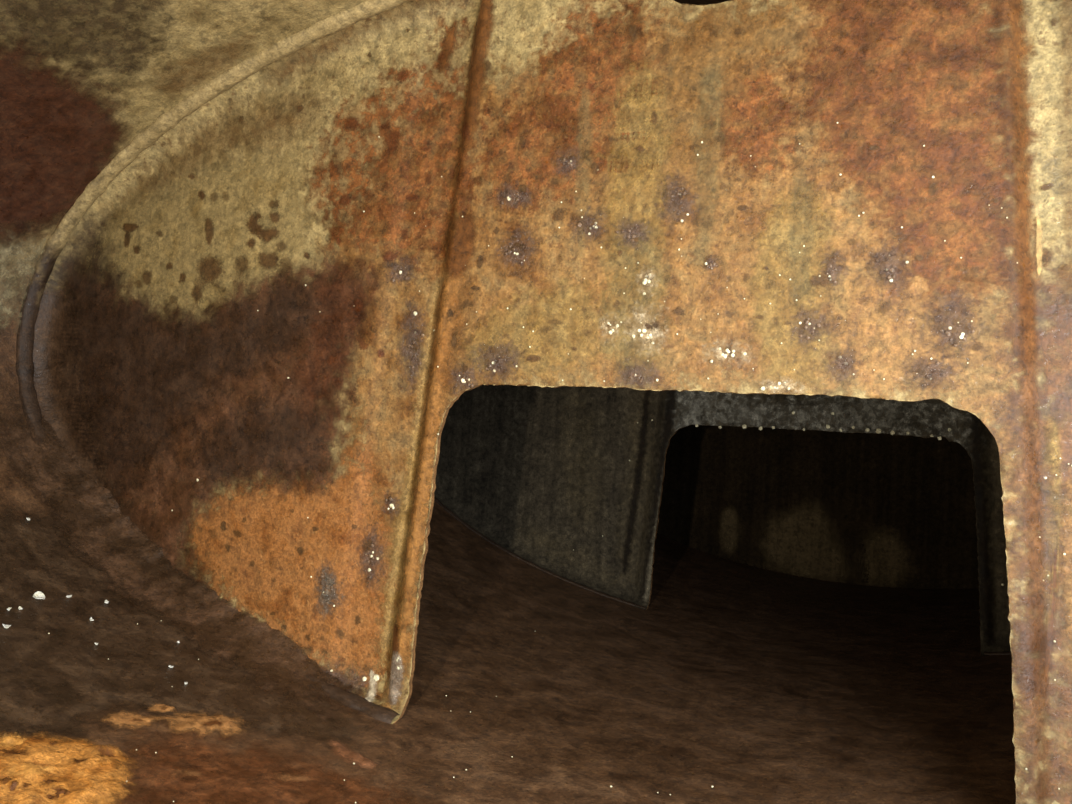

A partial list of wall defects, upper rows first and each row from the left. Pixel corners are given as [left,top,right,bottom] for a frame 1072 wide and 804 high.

rust [328,286,345,310]
rust [1032,268,1072,804]
rust [317,568,338,612]
rust [319,666,366,698]